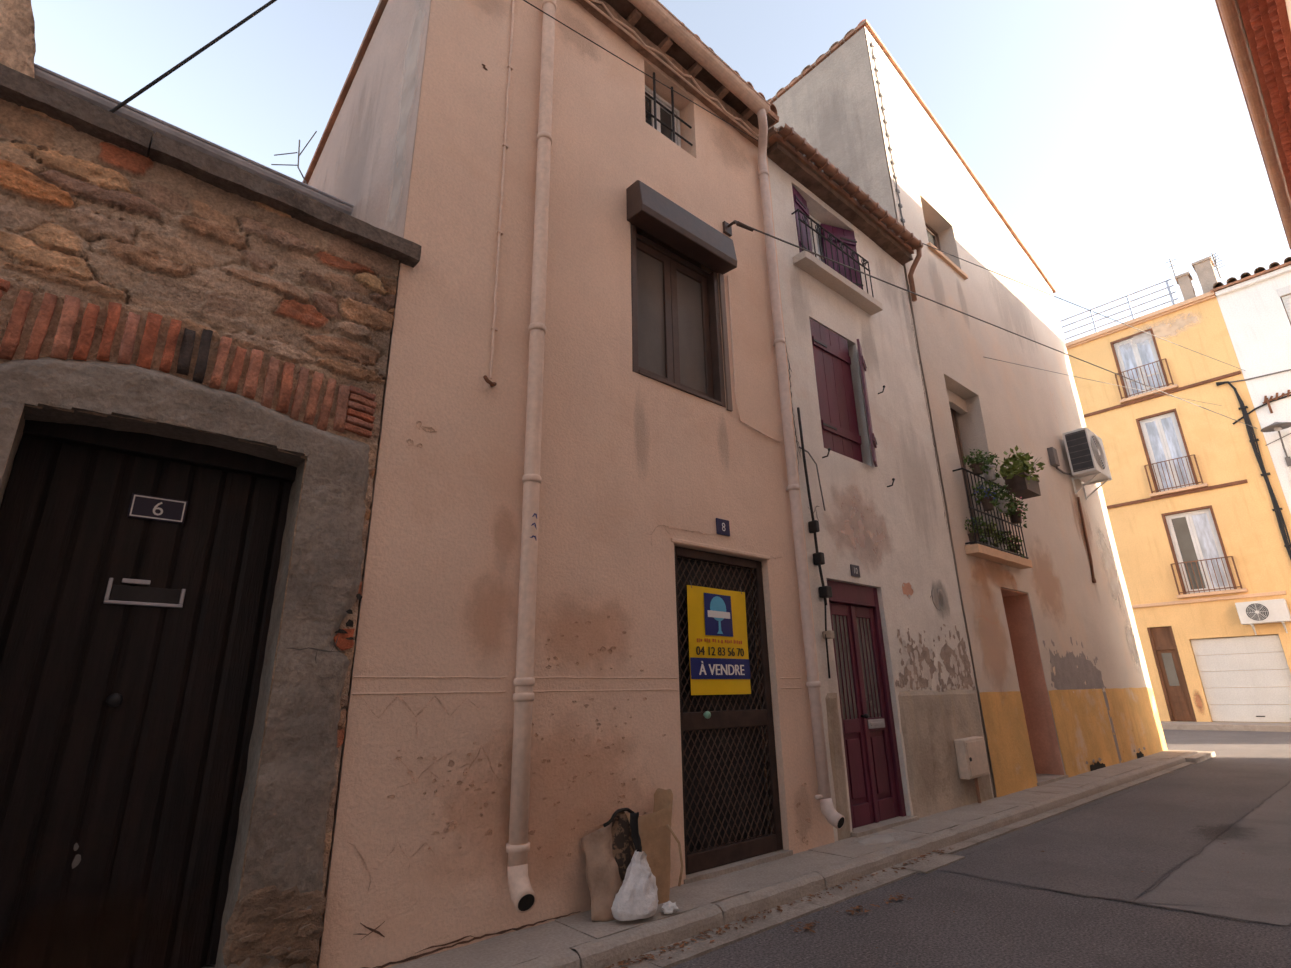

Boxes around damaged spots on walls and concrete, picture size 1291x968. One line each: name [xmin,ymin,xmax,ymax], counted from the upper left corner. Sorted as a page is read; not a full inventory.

peeling [895,624,975,692]
peeling [1043,637,1155,771]